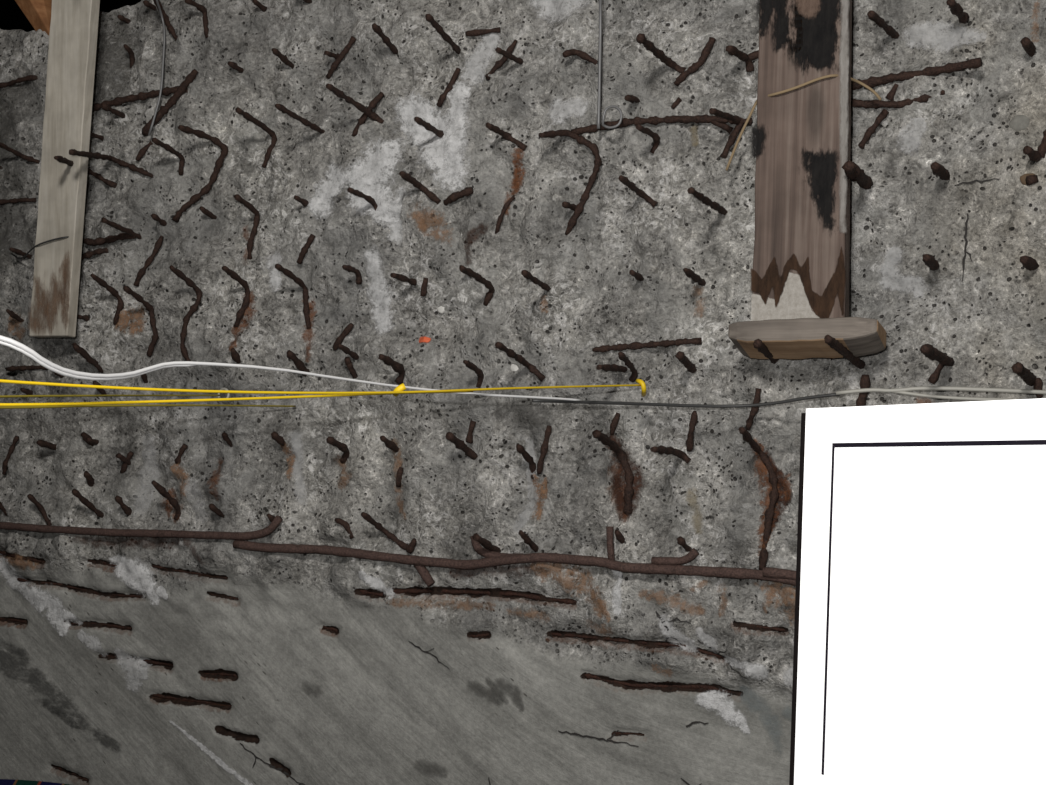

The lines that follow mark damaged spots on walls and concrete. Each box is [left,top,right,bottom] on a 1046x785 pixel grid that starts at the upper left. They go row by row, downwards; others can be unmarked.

spalling [538,33,759,235]
spalling [851,57,982,149]
corrosion [505,148,525,215]
spalling [81,125,228,383]
peeling [751,273,819,321]
spalling [0,388,796,605]
corrosion [607,434,643,519]
corrosion [753,439,792,553]
water stain [0,554,151,692]
water stain [109,555,168,605]
crack [558,730,639,747]
water stain [697,690,750,734]